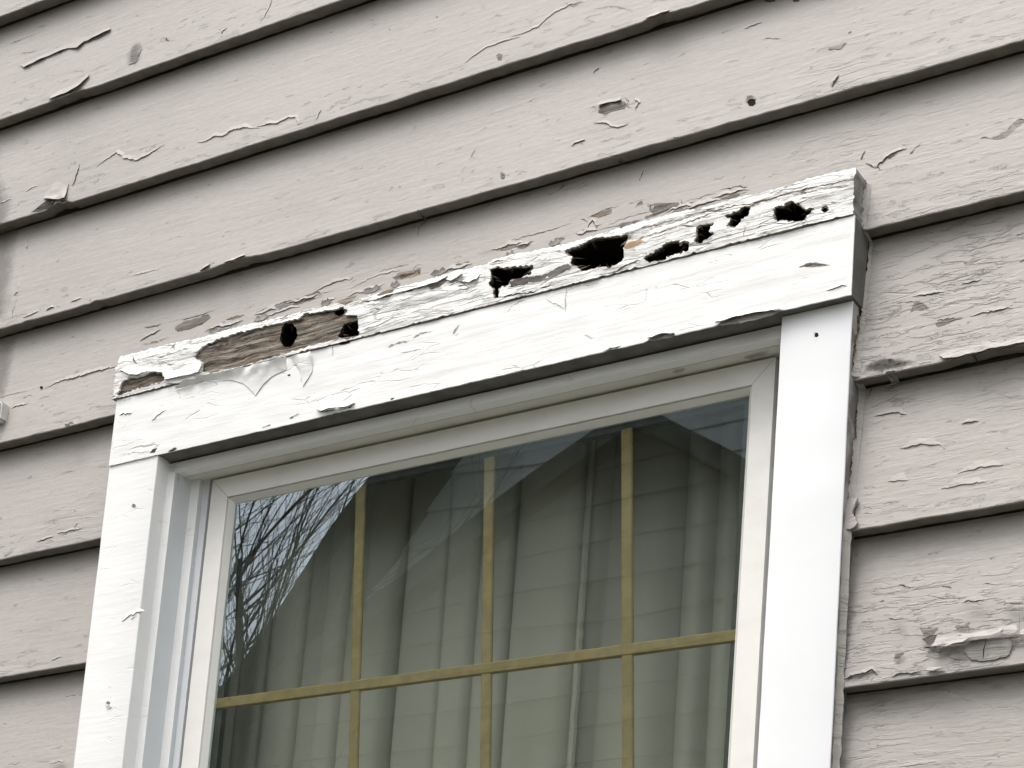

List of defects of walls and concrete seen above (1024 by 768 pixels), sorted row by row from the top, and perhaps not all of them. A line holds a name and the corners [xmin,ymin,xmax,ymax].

peeling [10,27,110,67]
peeling [48,73,89,99]
peeling [591,97,641,128]
peeling [26,164,80,213]
peeling [548,185,748,246]
peeling [121,357,202,379]
peeling [962,583,993,603]
peeling [920,597,1024,661]